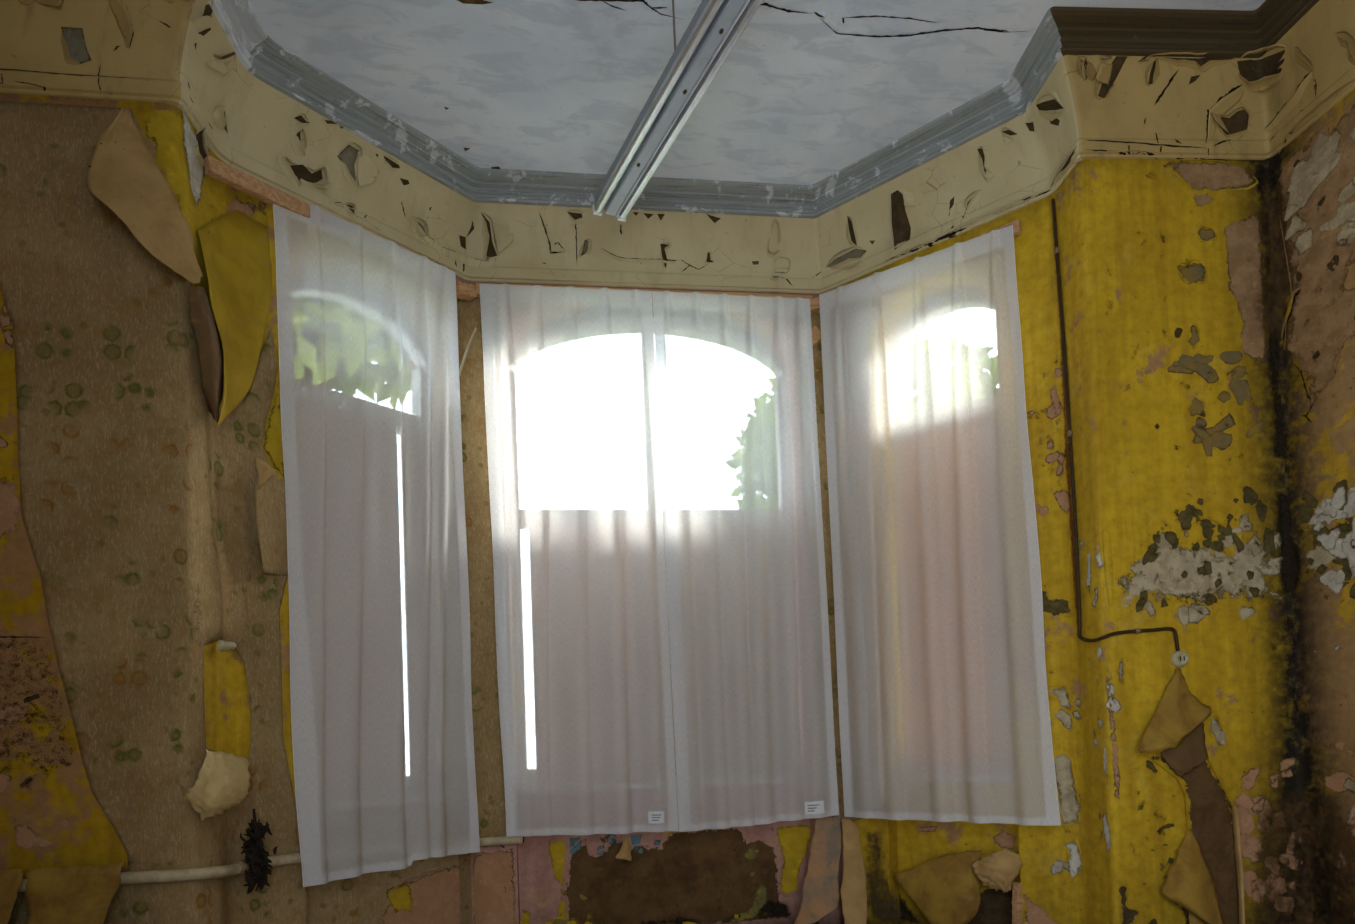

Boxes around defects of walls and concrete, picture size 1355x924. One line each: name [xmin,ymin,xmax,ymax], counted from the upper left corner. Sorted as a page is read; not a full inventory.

crack [578,0,684,20]
crack [760,3,1026,37]
spalling [142,105,269,380]
peeling [826,190,917,269]
spalling [1072,30,1355,406]
spalling [1168,214,1268,461]
spalling [264,382,285,482]
spalling [1114,470,1355,626]
mould [1276,492,1301,595]
spalling [1146,714,1303,924]
spalling [520,824,811,924]
spalling [968,889,1057,924]